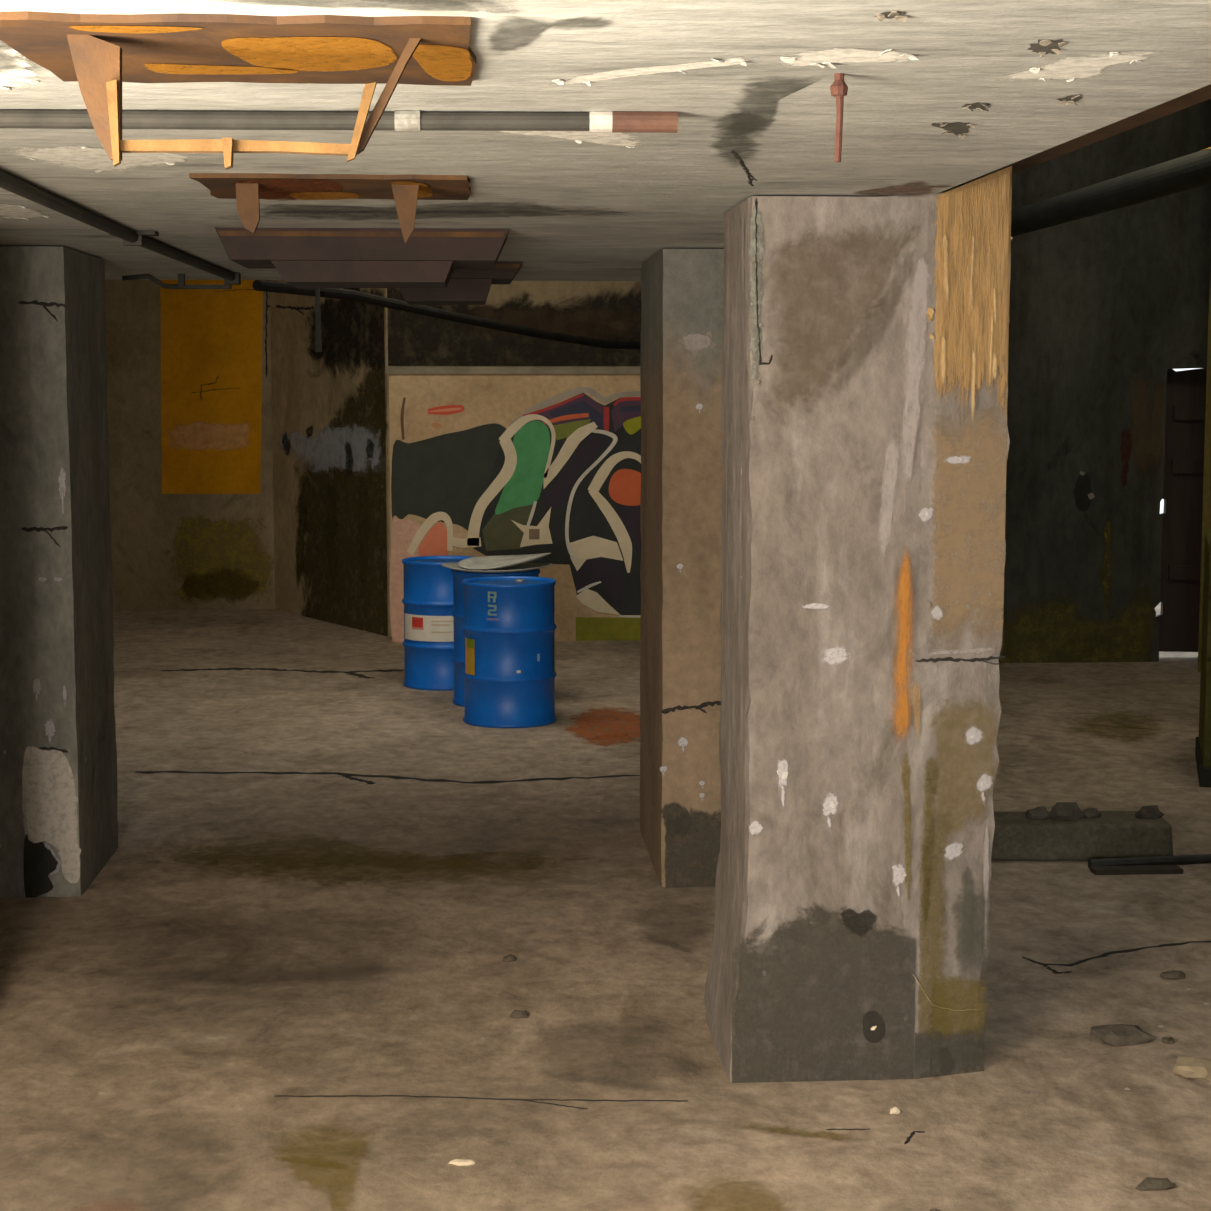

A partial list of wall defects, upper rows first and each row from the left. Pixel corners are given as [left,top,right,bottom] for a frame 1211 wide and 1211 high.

peeling [552,58,747,86]
peeling [780,48,919,69]
peeling [1008,39,1154,106]
crack [716,150,757,186]
leakage [714,114,763,160]
leakage [279,360,388,636]
rust [895,557,921,734]
crack [916,648,1006,664]
crack [661,701,721,714]
spalling [22,746,81,898]
rust [902,756,911,893]
leakage [732,905,985,1083]